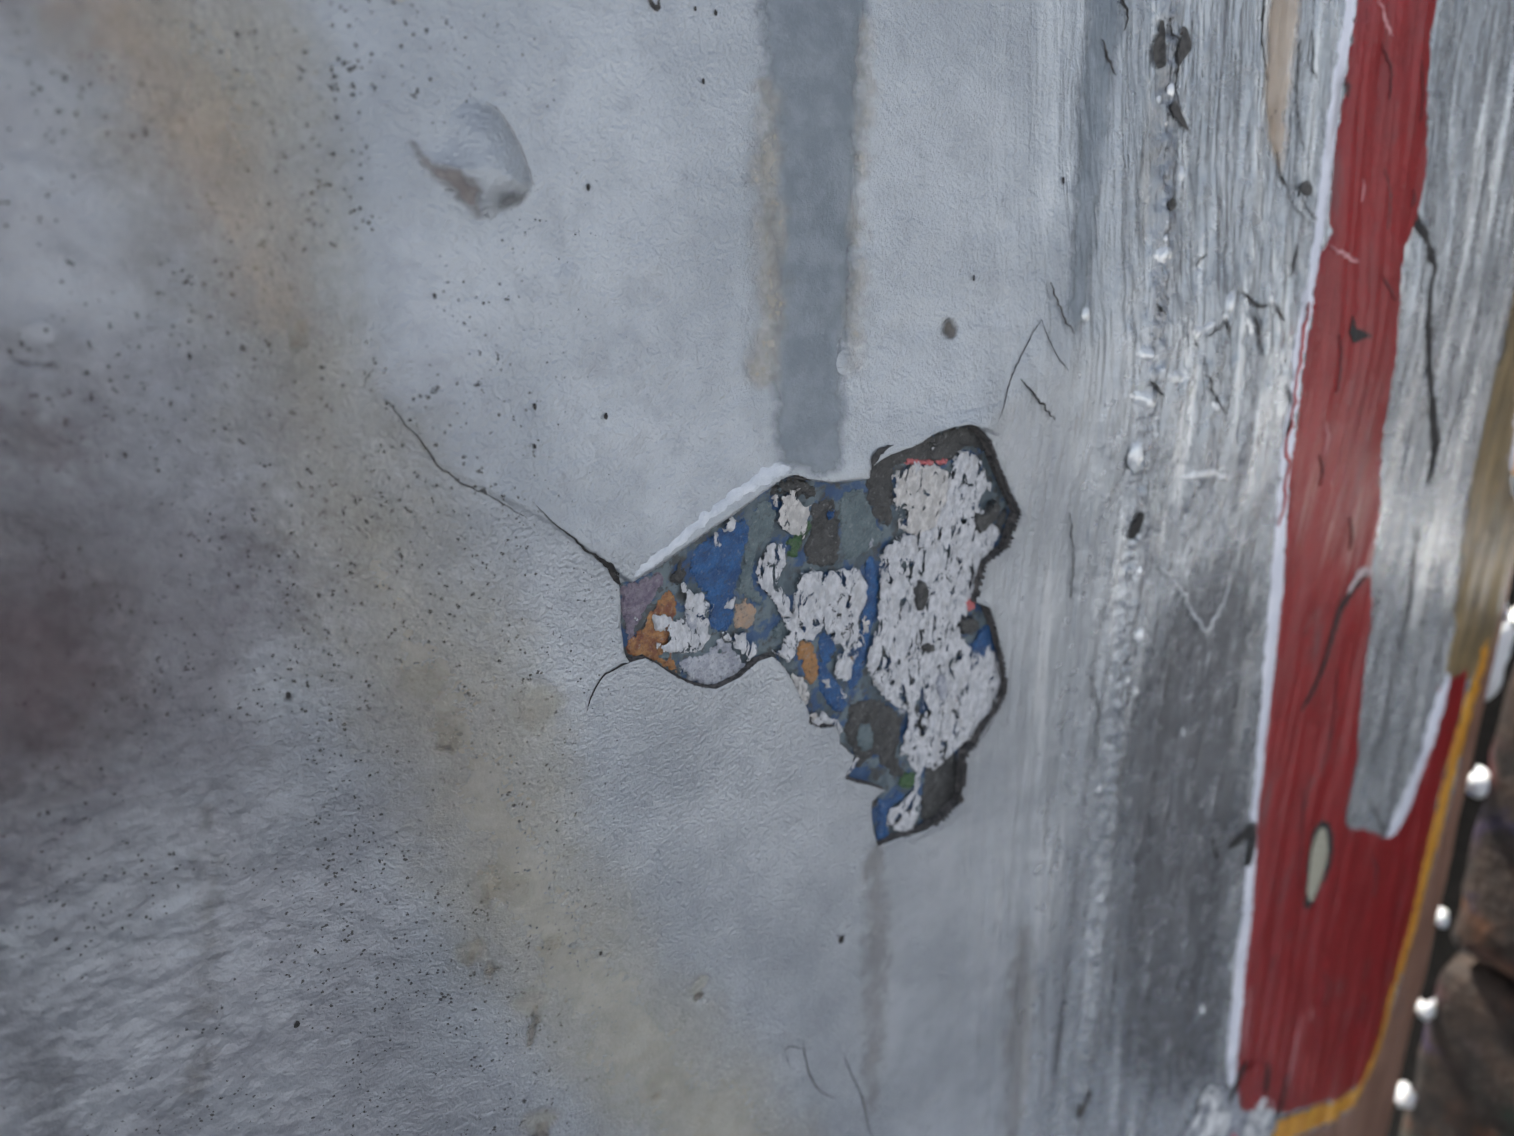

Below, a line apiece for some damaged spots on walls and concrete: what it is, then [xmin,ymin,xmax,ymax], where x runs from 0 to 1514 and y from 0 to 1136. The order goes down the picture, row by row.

water stain [761,0,864,472]
crack [364,369,621,585]
spalling [619,425,1018,841]